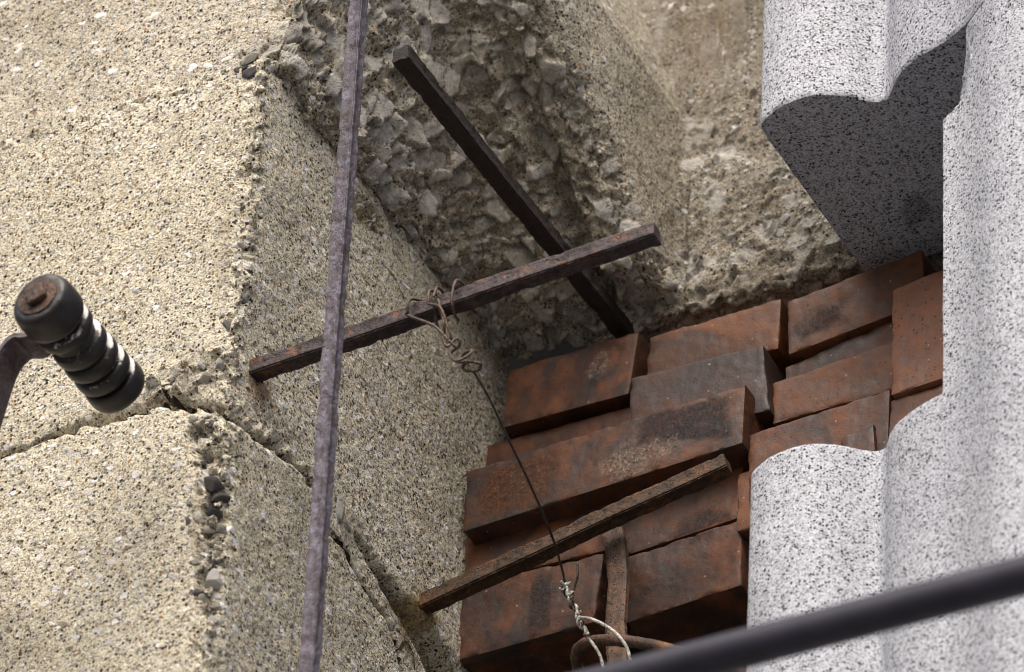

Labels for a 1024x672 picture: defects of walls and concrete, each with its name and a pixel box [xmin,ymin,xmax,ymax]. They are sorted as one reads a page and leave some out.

spalling [352,201,383,237]
crack [127,365,255,442]
crack [330,536,374,606]
crack [392,639,415,669]